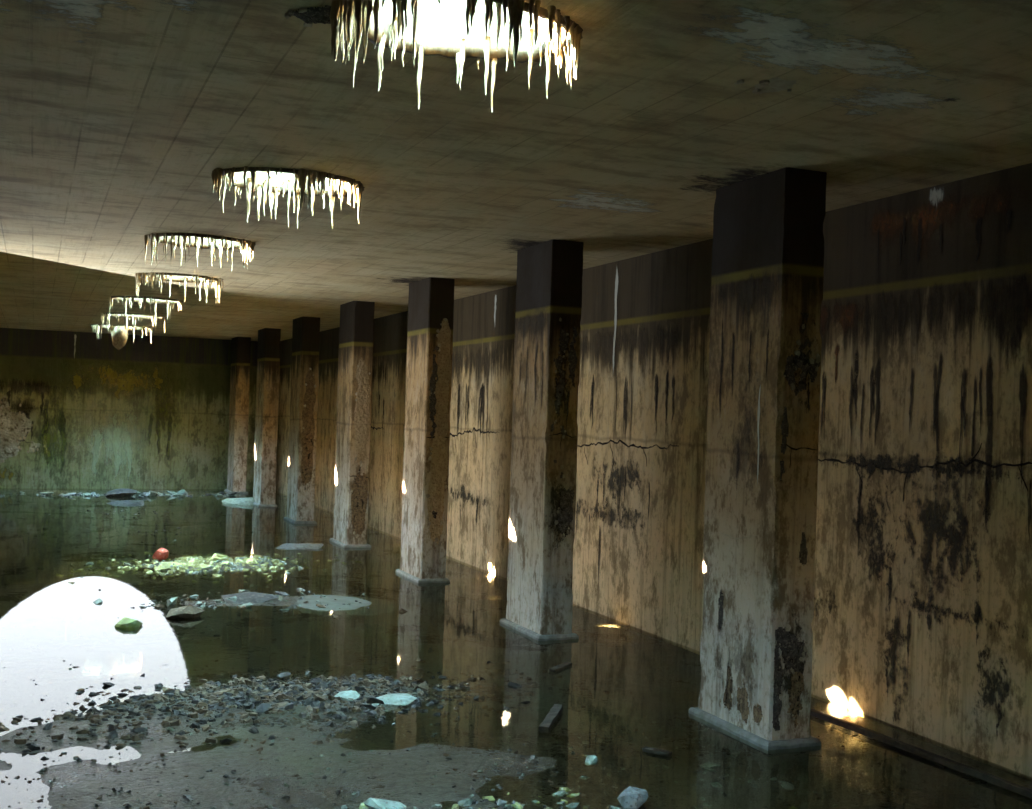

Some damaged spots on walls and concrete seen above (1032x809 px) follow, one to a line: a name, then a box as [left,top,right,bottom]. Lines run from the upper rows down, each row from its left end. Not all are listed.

spalling [0,395,45,463]
water stain [0,379,57,439]
crack [549,432,678,470]
crack [781,443,1032,501]
water stain [793,276,1032,735]
spalling [723,624,807,731]